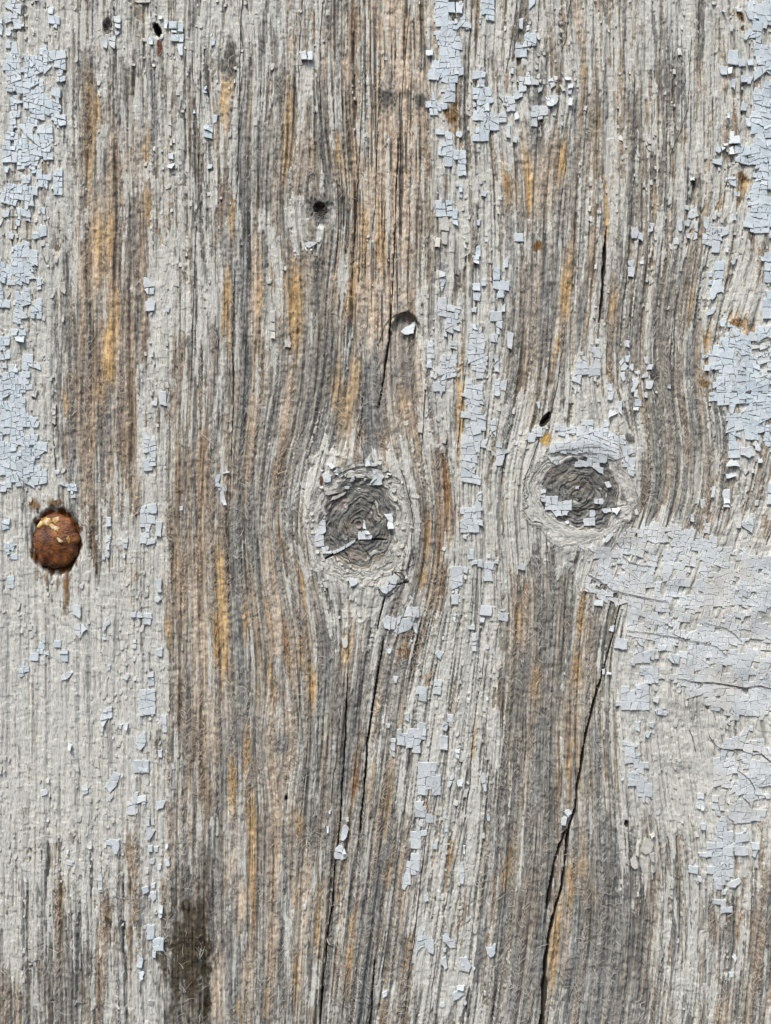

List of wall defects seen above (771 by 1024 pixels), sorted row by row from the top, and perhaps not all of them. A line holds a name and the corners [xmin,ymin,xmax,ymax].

peeling [0,0,77,498]
corrosion [29,500,82,611]
crack [280,0,414,1024]
peeling [427,256,514,623]
peeling [425,0,574,248]
peeling [579,0,771,913]
crack [539,574,737,1024]